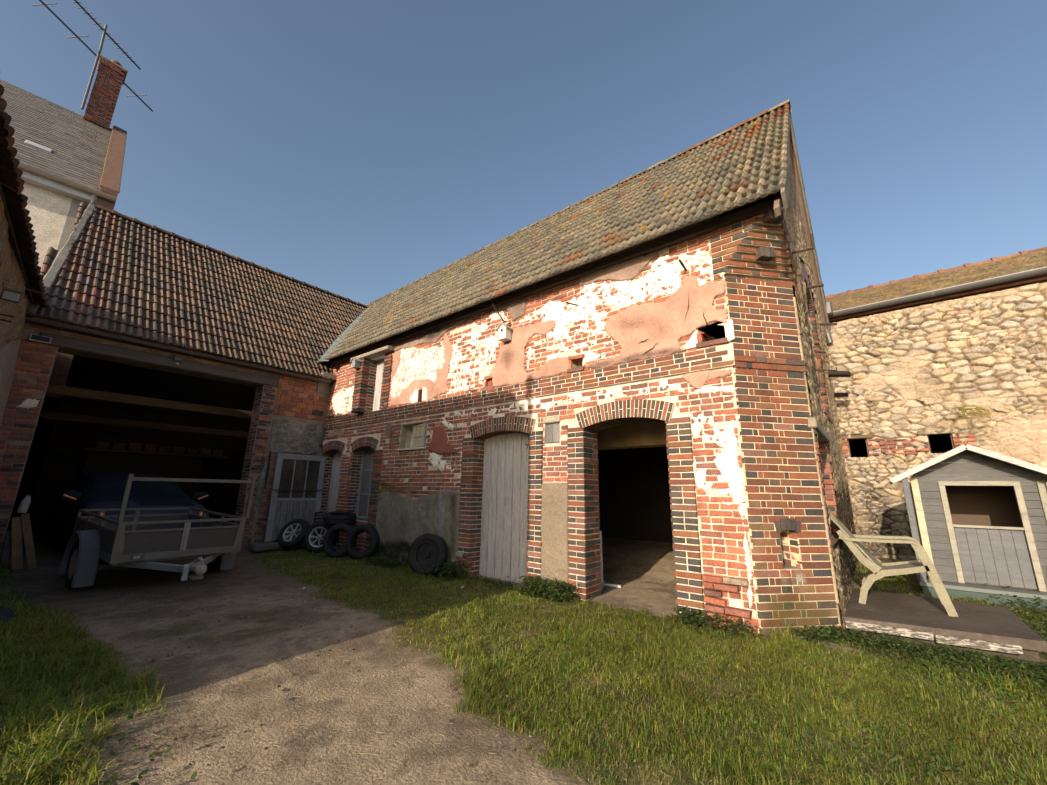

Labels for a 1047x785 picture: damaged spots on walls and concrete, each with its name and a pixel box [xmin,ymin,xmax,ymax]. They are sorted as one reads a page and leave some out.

flaking render [579,255,653,286]
flaking render [390,275,735,405]